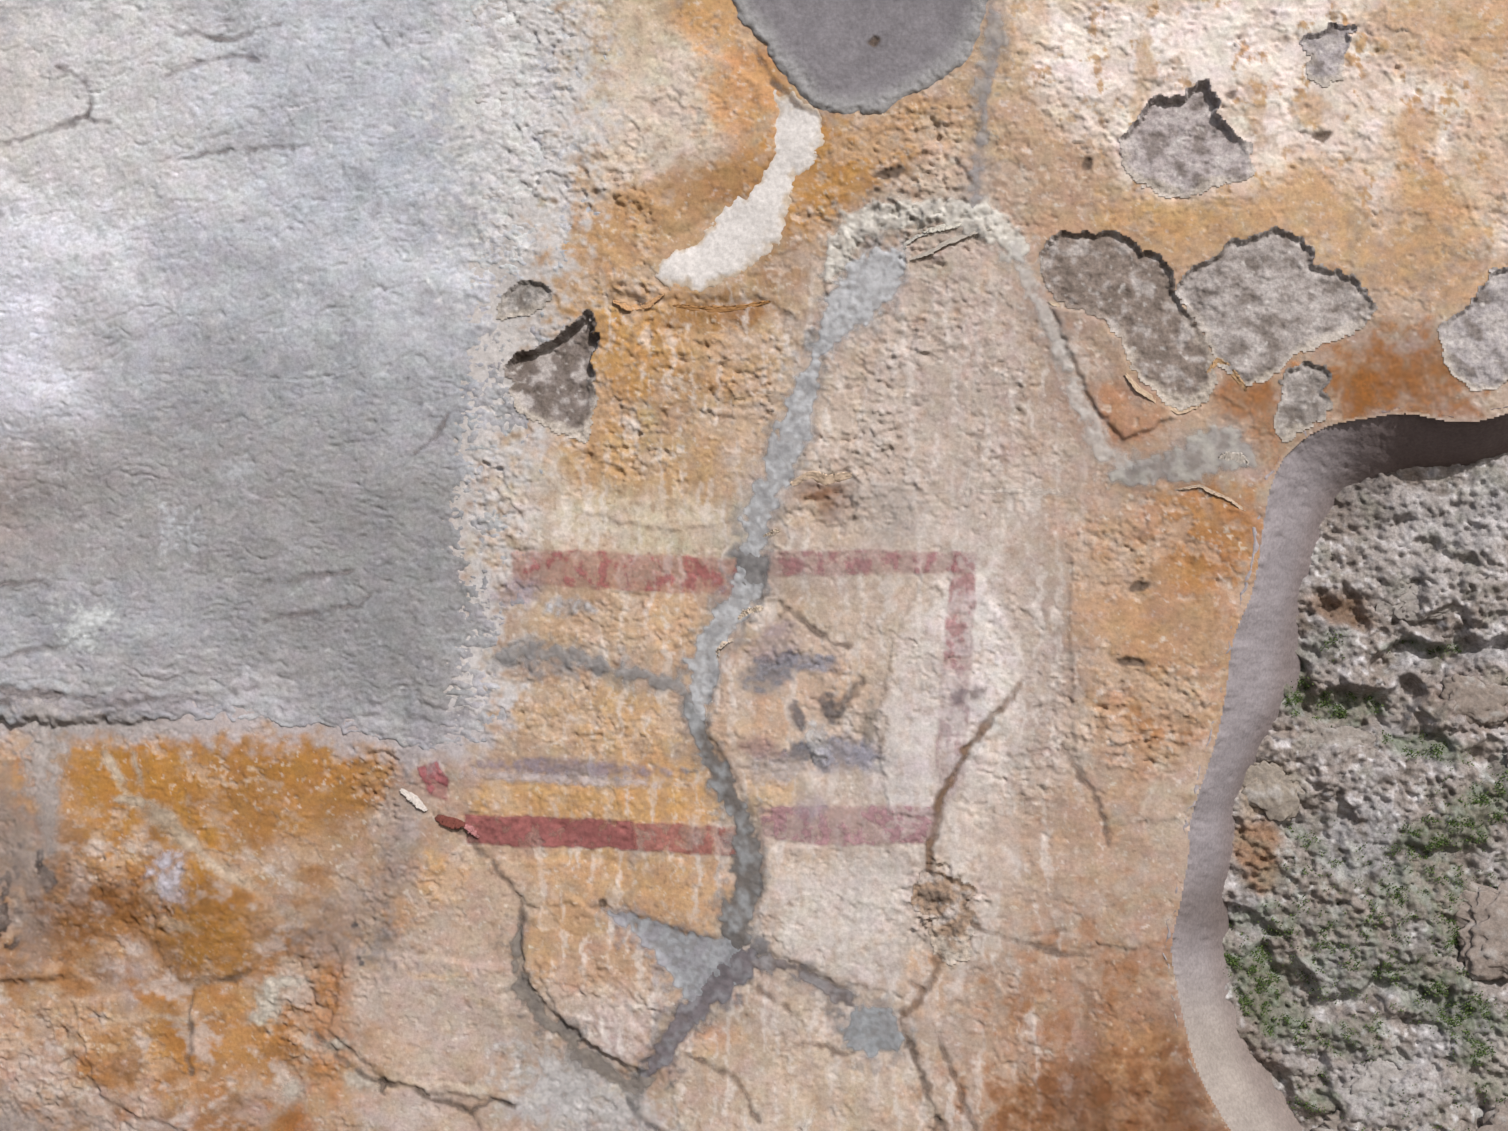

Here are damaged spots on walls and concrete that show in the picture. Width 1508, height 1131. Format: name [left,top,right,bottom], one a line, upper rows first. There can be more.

spalling [1119,78,1256,198]
spalling [503,309,600,443]
crack [495,8,1257,1131]
spalling [1039,225,1508,1131]
crack [459,830,497,871]